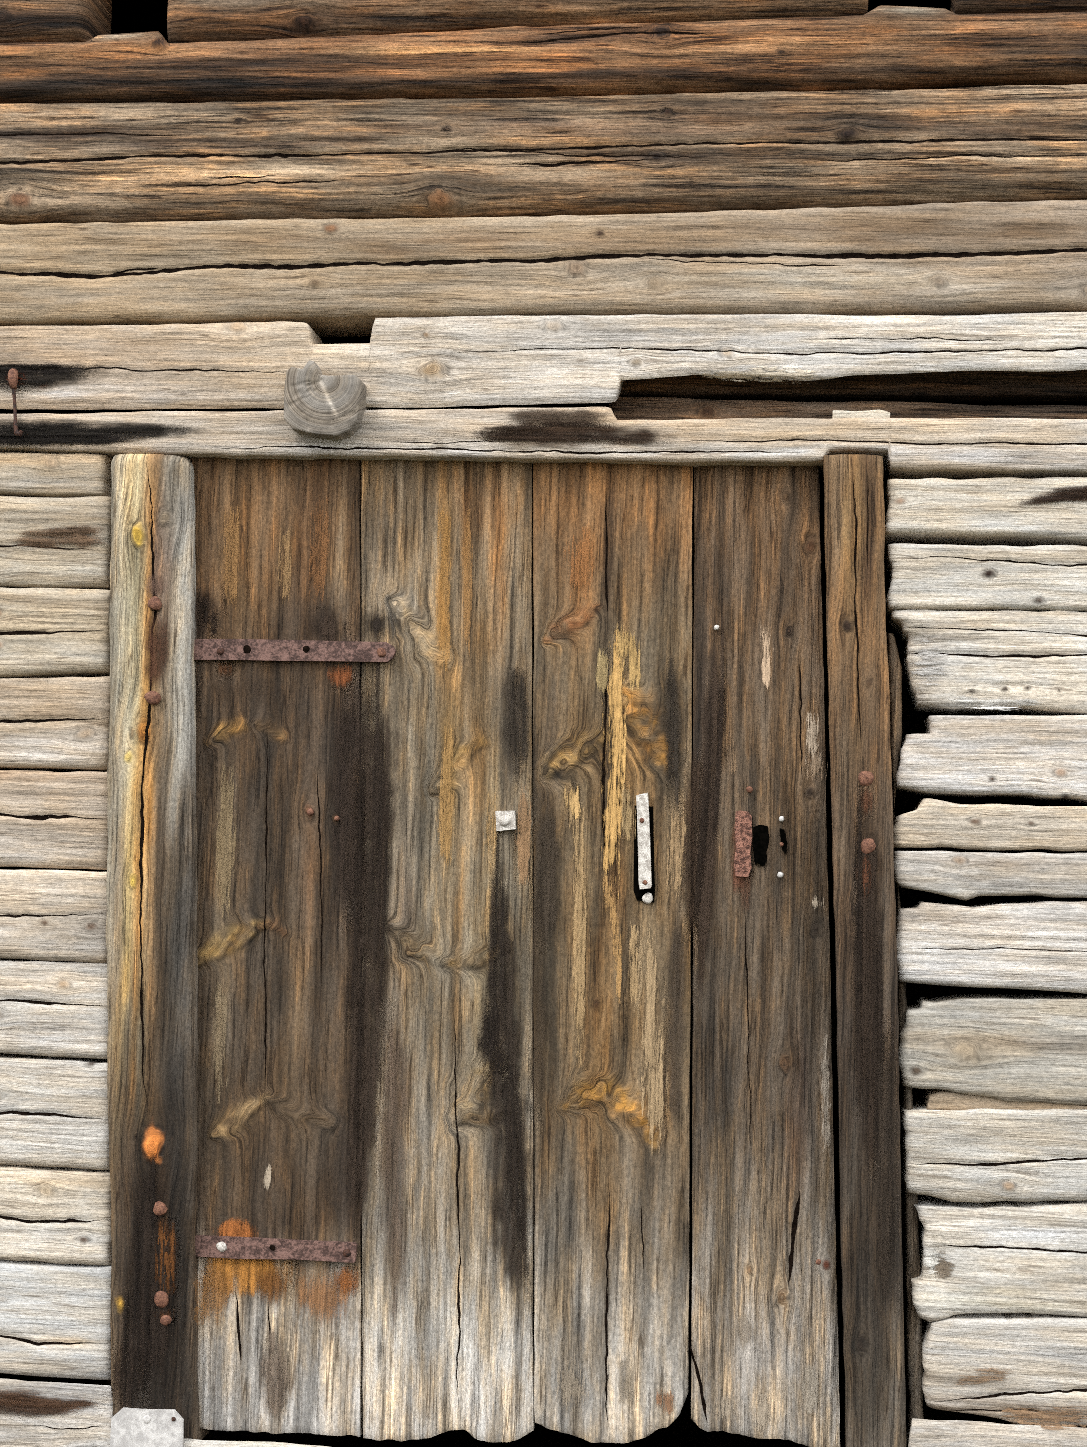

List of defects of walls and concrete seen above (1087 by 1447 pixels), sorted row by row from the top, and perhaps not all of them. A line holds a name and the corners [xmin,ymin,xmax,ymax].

crack [0,248,1087,279]
crack [146,462,157,631]
crack [0,716,103,724]
crack [0,812,105,820]
crack [139,679,152,1112]
crack [0,911,97,919]
crack [0,998,102,1006]
corrosion [219,1220,251,1237]
crack [788,1191,800,1284]
corrosion [155,1225,175,1288]
corrosion [201,1258,356,1318]